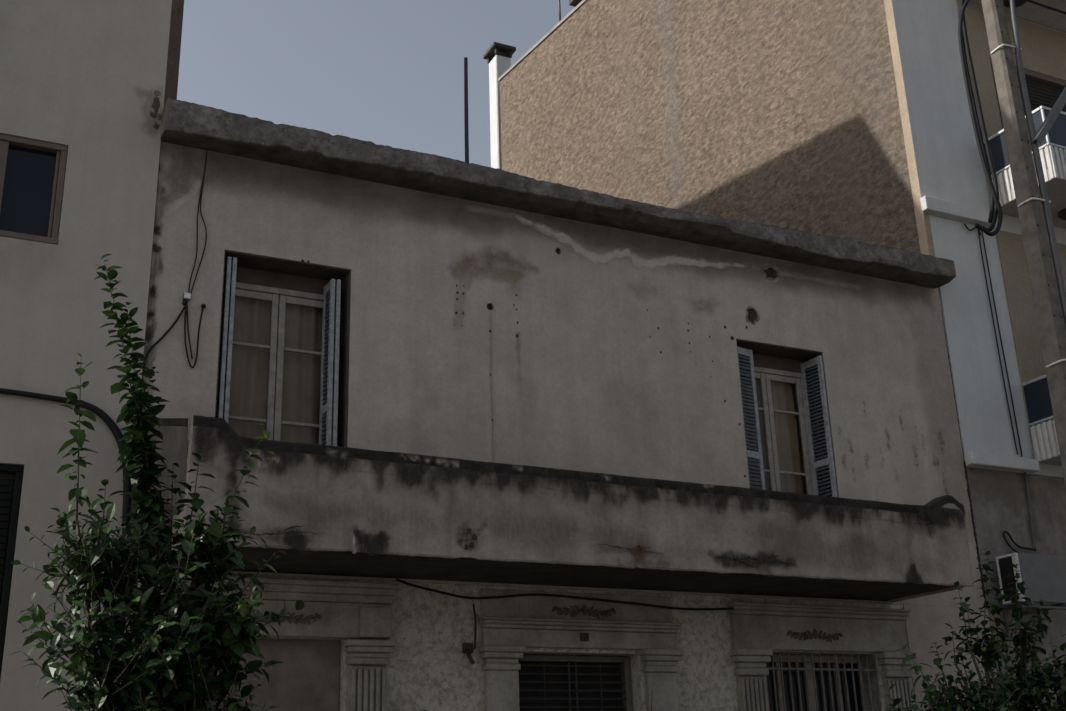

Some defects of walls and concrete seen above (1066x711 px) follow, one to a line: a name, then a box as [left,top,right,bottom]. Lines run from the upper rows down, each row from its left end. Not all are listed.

water stain [162,146,915,297]
water stain [145,286,155,363]
spalling [745,306,760,325]
water stain [194,417,965,535]
crack [215,518,320,549]
water stain [353,529,390,556]